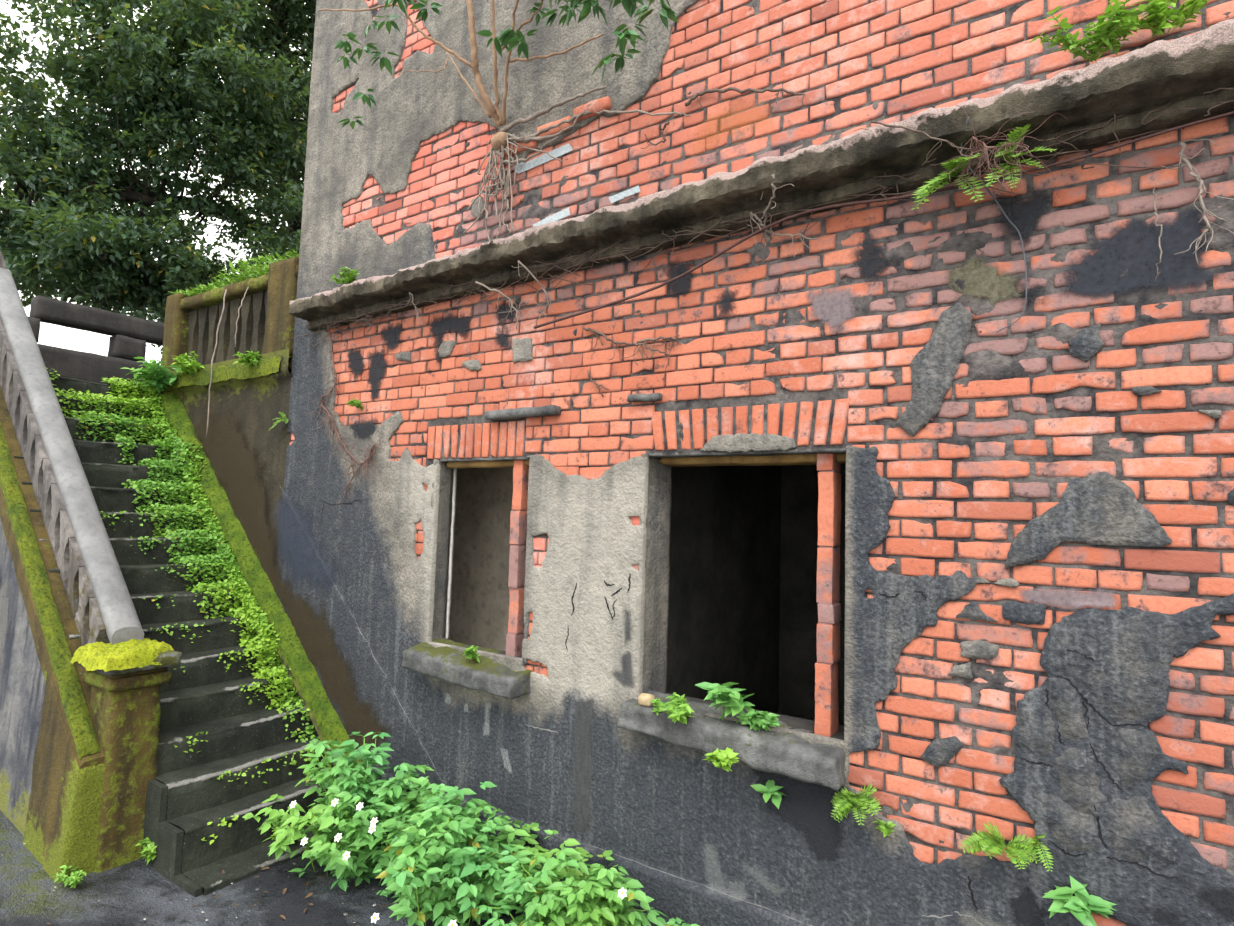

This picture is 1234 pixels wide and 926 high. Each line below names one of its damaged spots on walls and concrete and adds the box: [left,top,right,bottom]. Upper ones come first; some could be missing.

spalling [332,85,355,114]
spalling [342,0,1234,258]
damp [1063,207,1220,297]
mould [348,324,402,399]
mould [429,314,471,363]
mould [495,302,517,348]
spalling [330,116,1234,870]
crack [565,573,631,652]
damp [614,611,633,686]
crack [1020,649,1179,879]
damp [755,771,849,861]
spalling [1085,913,1126,926]